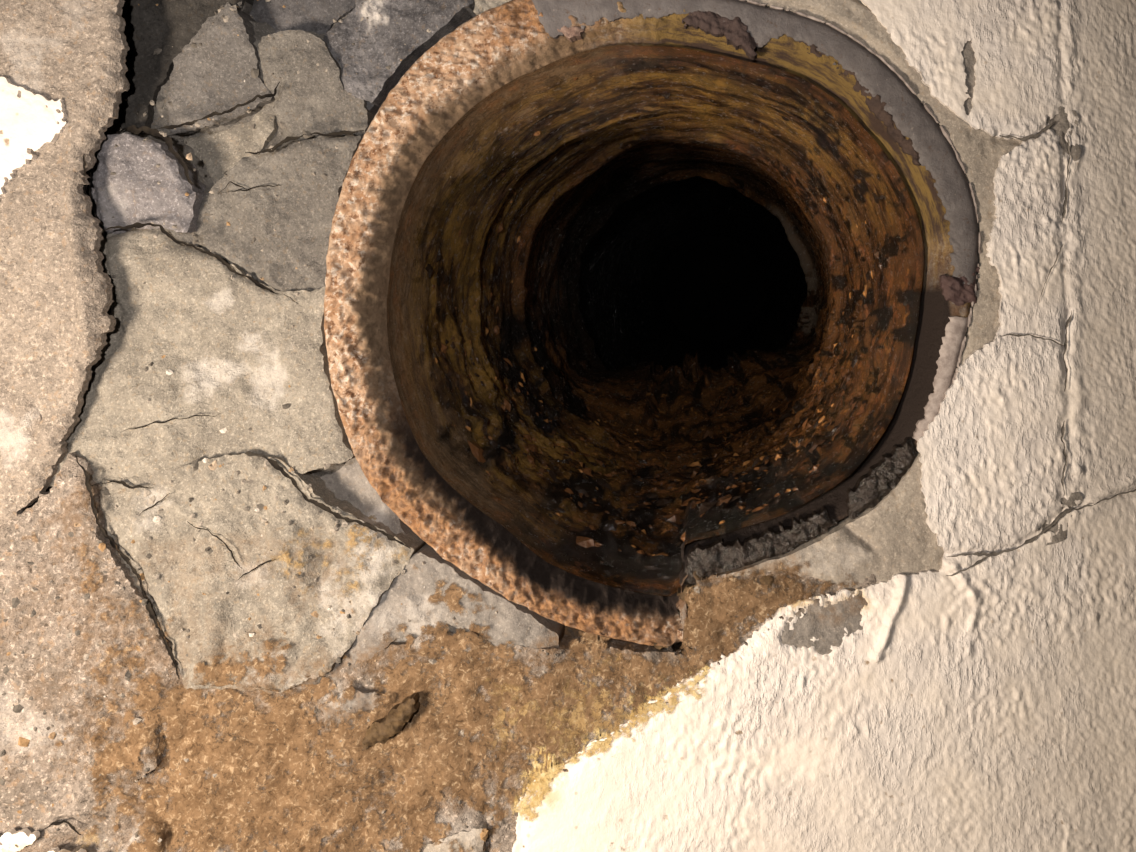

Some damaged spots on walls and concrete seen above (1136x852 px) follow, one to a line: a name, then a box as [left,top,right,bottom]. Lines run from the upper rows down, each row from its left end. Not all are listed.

crack [116,82,280,185]
peeling [799,41,921,166]
peeling [956,41,976,125]
crack [83,155,297,303]
peeling [939,267,980,306]
crack [75,456,180,679]
crack [262,456,411,549]
corrosion [323,516,379,592]
spalling [0,0,876,852]
peeling [846,437,918,519]
crack [946,421,1136,576]
corrosion [52,544,855,852]